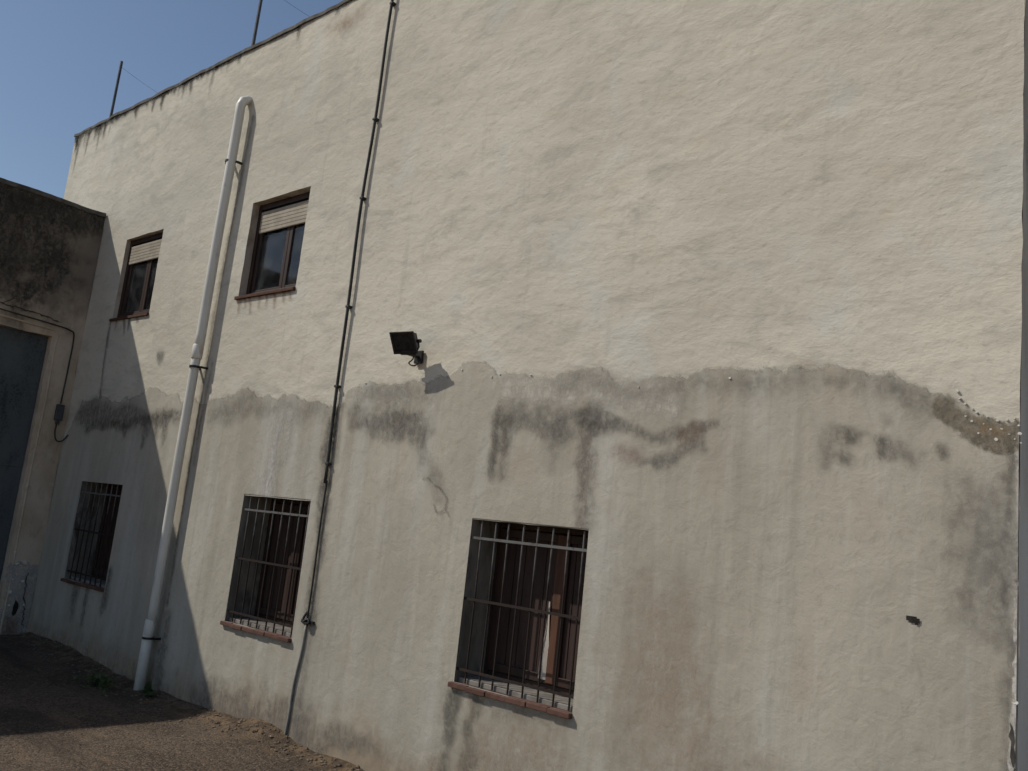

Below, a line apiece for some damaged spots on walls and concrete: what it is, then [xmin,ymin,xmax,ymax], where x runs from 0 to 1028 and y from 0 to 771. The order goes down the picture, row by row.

damp [75,63,225,155]
damp [0,182,105,310]
damp [309,410,338,618]
peeling [27,361,1022,771]
damp [489,409,711,499]